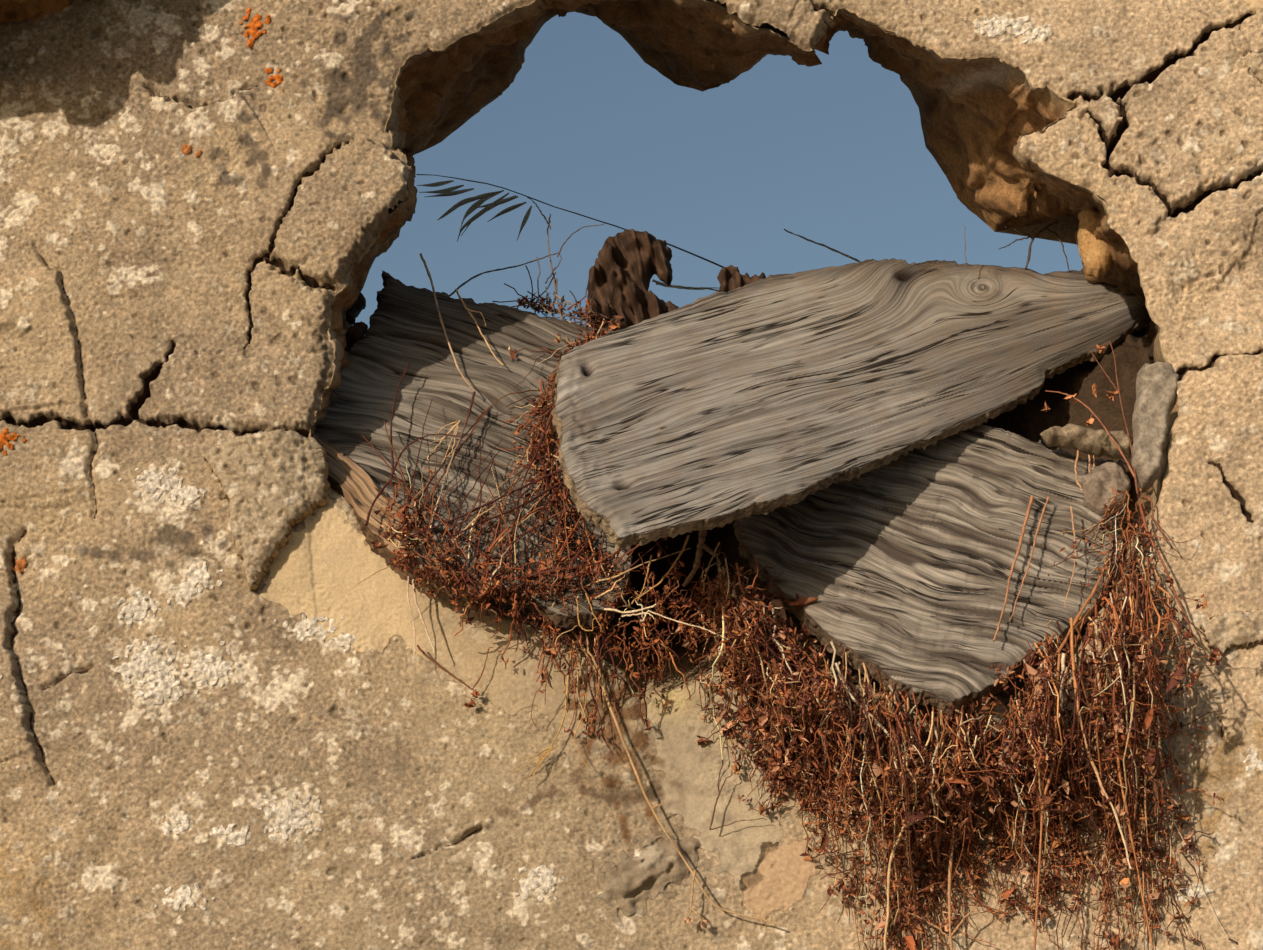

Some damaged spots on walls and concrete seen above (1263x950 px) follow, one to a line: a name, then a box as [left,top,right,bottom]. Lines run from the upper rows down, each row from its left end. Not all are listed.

crack [1067,12,1263,218]
crack [245,141,350,349]
crack [1,247,259,519]
crack [296,429,313,438]
crack [1177,349,1263,381]
crack [1208,461,1254,523]
crack [11,530,91,785]